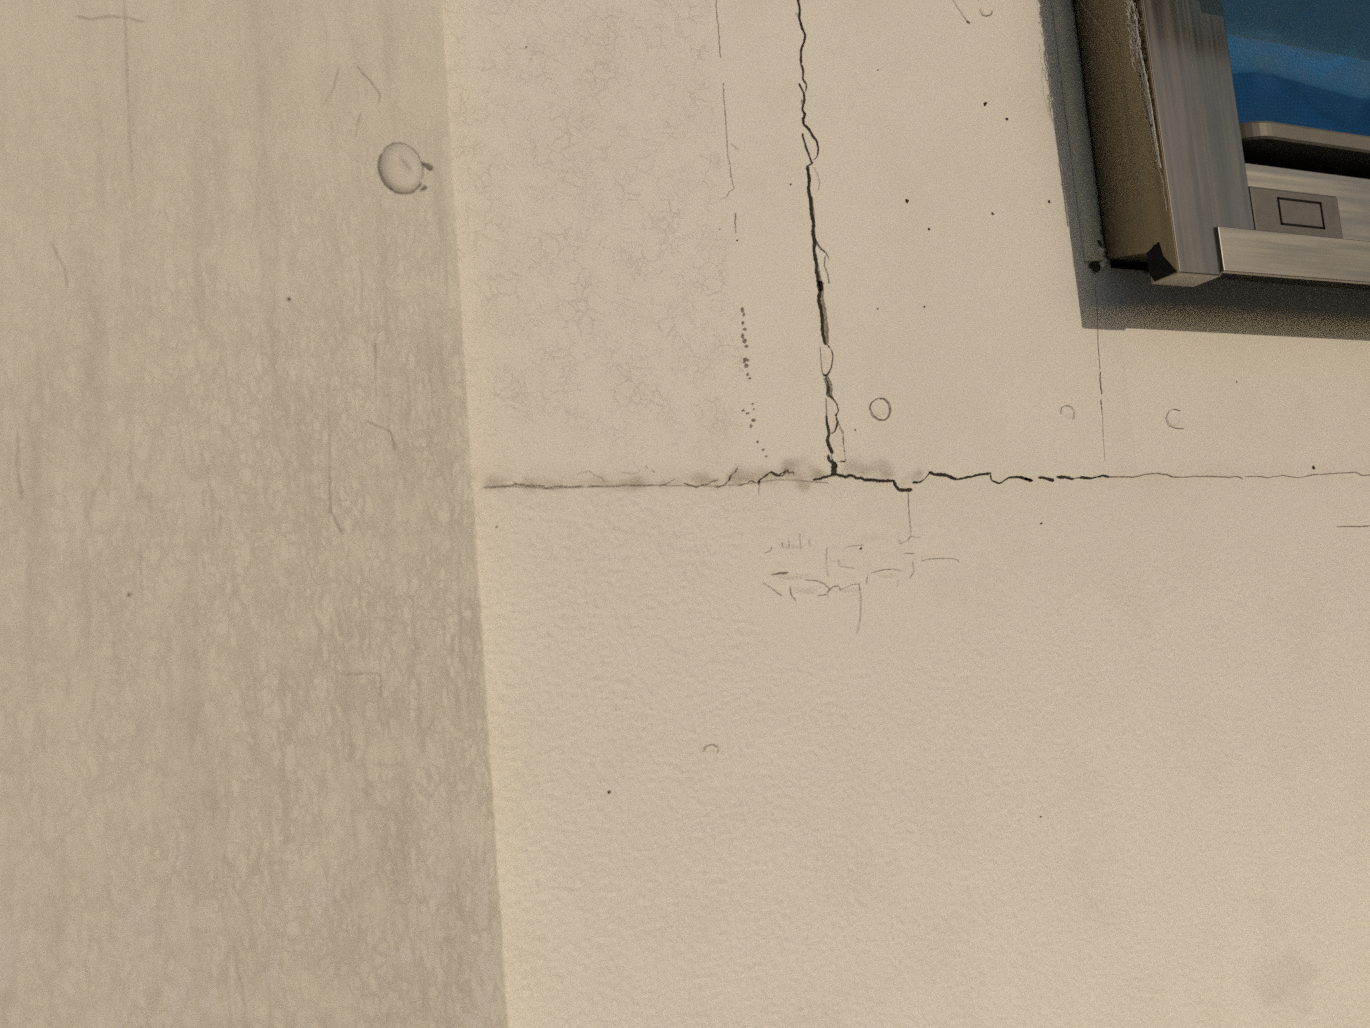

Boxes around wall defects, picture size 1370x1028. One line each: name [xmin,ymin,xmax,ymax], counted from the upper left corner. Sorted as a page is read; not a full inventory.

crack [484,0,1370,494]